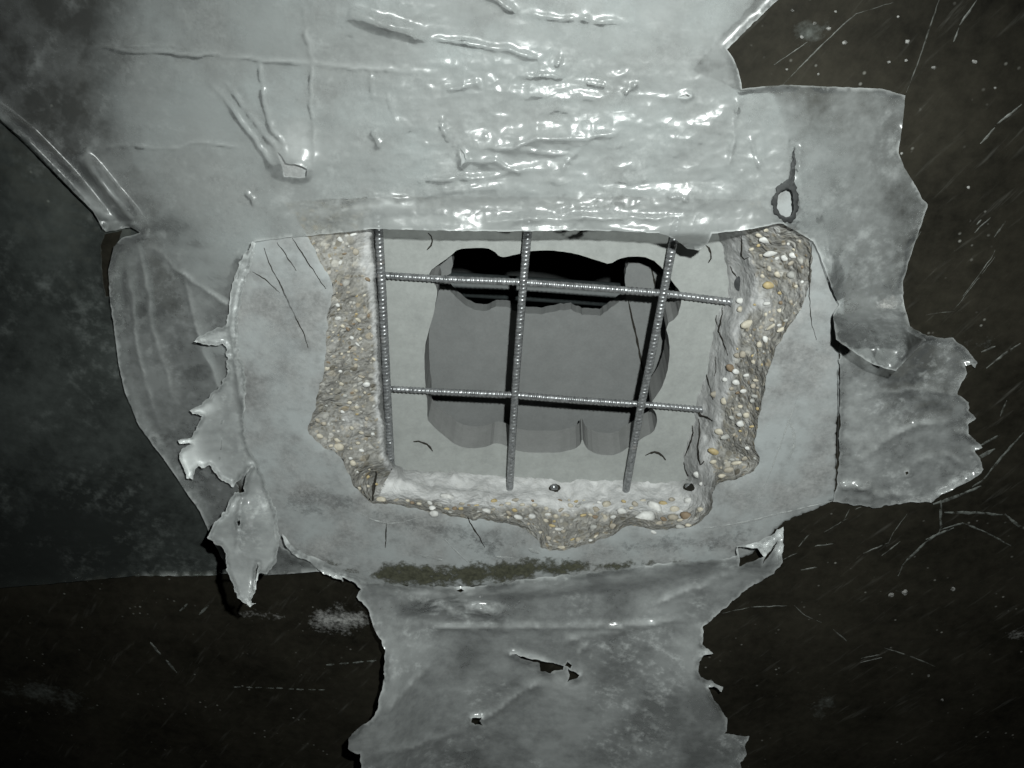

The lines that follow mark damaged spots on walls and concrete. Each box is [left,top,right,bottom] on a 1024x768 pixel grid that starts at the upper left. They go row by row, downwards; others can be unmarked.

crack [253,238,326,347]
peeling [111,0,850,589]
leakage [371,540,632,587]